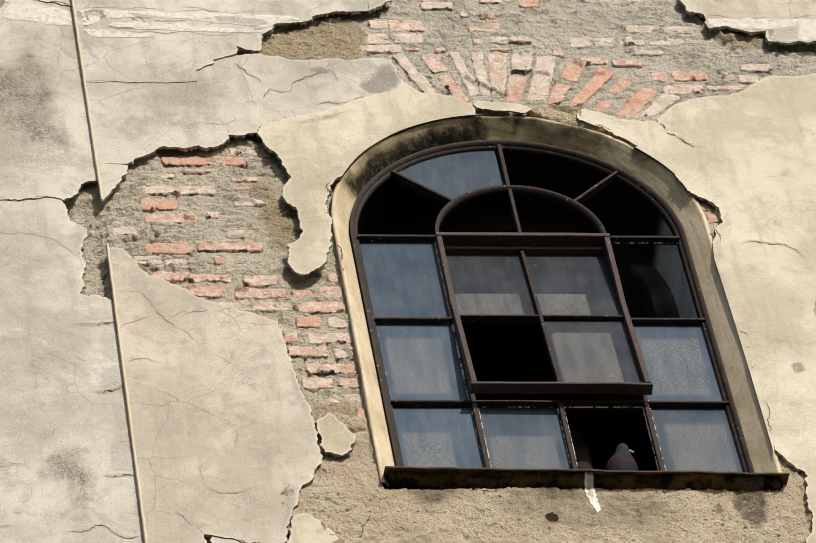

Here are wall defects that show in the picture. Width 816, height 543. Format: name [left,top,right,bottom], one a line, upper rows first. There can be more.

crack [237,60,353,97]
flaking render [0,0,816,153]
crack [97,282,230,339]
flaking render [63,102,813,543]